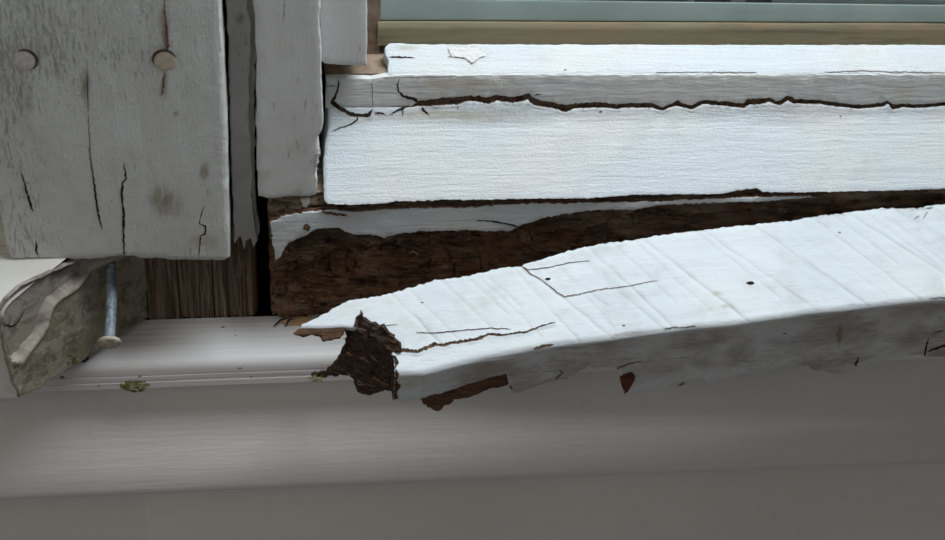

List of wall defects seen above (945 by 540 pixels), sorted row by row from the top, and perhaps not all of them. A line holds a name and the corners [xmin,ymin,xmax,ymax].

crack [152,0,176,97]
crack [326,56,945,131]
crack [87,71,127,255]
crack [21,174,33,211]
crack [198,208,206,258]
crack [522,260,658,298]
crack [388,322,556,357]
crack [924,331,945,356]
spalling [390,355,401,400]
spalling [620,372,635,394]